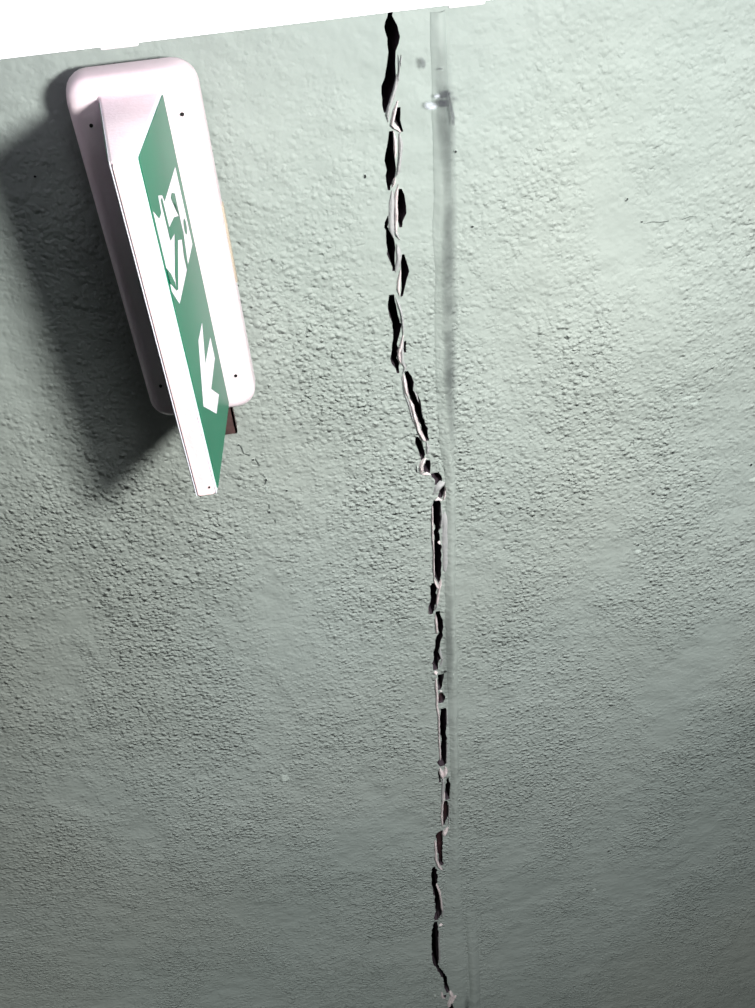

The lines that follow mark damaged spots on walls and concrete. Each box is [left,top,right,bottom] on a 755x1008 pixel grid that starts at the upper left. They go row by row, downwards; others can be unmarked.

crack [381,12,456,1008]